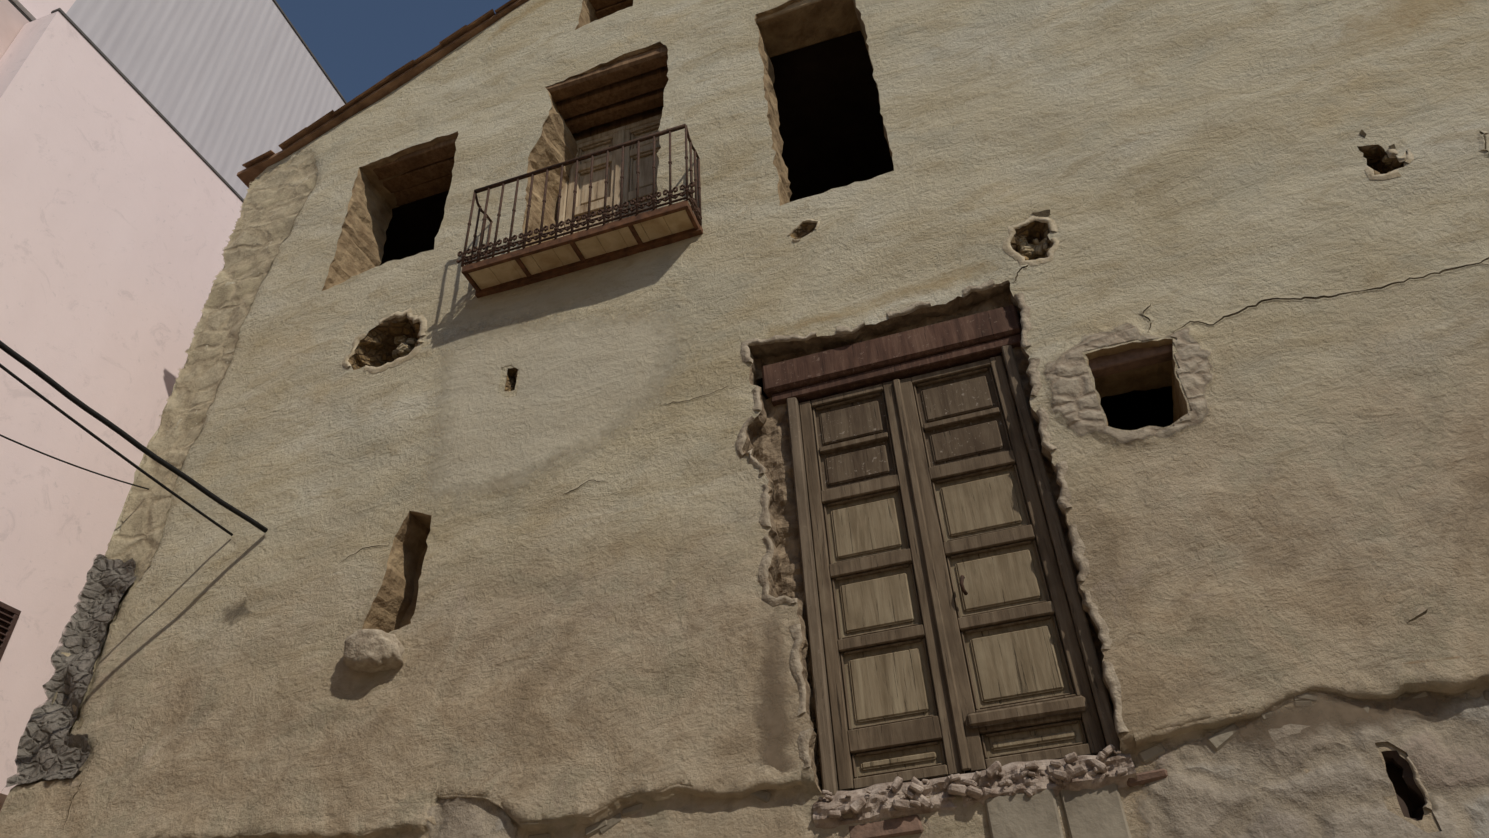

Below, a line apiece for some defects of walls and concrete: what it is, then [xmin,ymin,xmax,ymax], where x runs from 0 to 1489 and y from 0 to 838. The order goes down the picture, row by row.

spalling [1357,130,1414,180]
spalling [1002,210,1060,266]
spalling [342,308,427,374]
flaking render [755,336,831,379]
flaking render [849,282,1019,345]
crack [1138,253,1489,333]
flaking render [4,149,318,788]
flaking render [751,398,808,634]
flaking render [1001,347,1114,745]
flaking render [806,652,823,790]
flaking render [1139,695,1489,838]